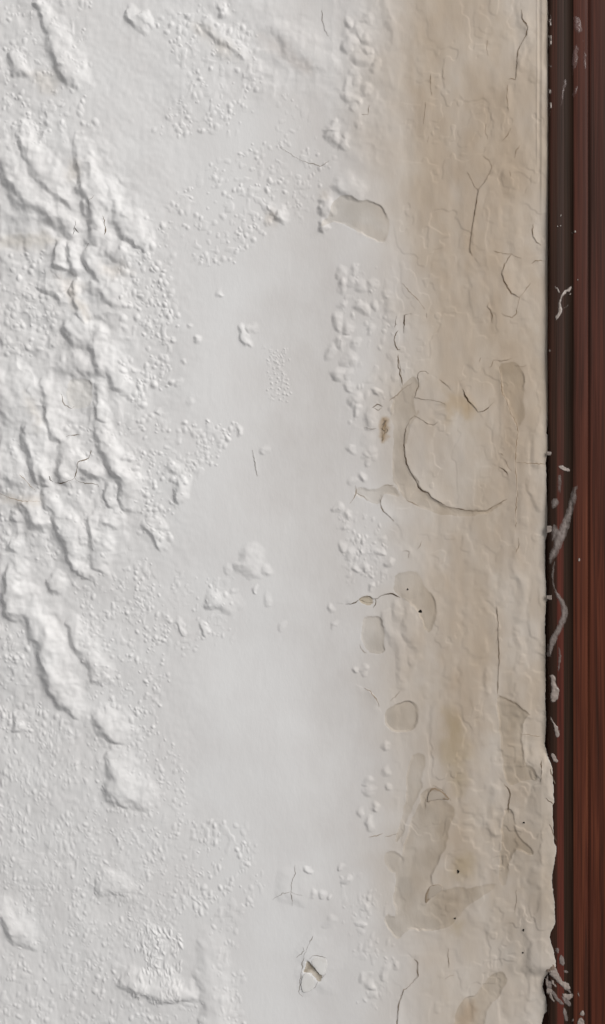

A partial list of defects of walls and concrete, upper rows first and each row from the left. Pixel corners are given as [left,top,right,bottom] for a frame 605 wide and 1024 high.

crack [469,10,542,318]
peeling [321,195,390,242]
peeling [500,362,525,426]
peeling [355,377,502,516]
peeling [359,595,385,654]
peeling [393,571,437,632]
peeling [385,701,418,732]
peeling [301,957,327,992]